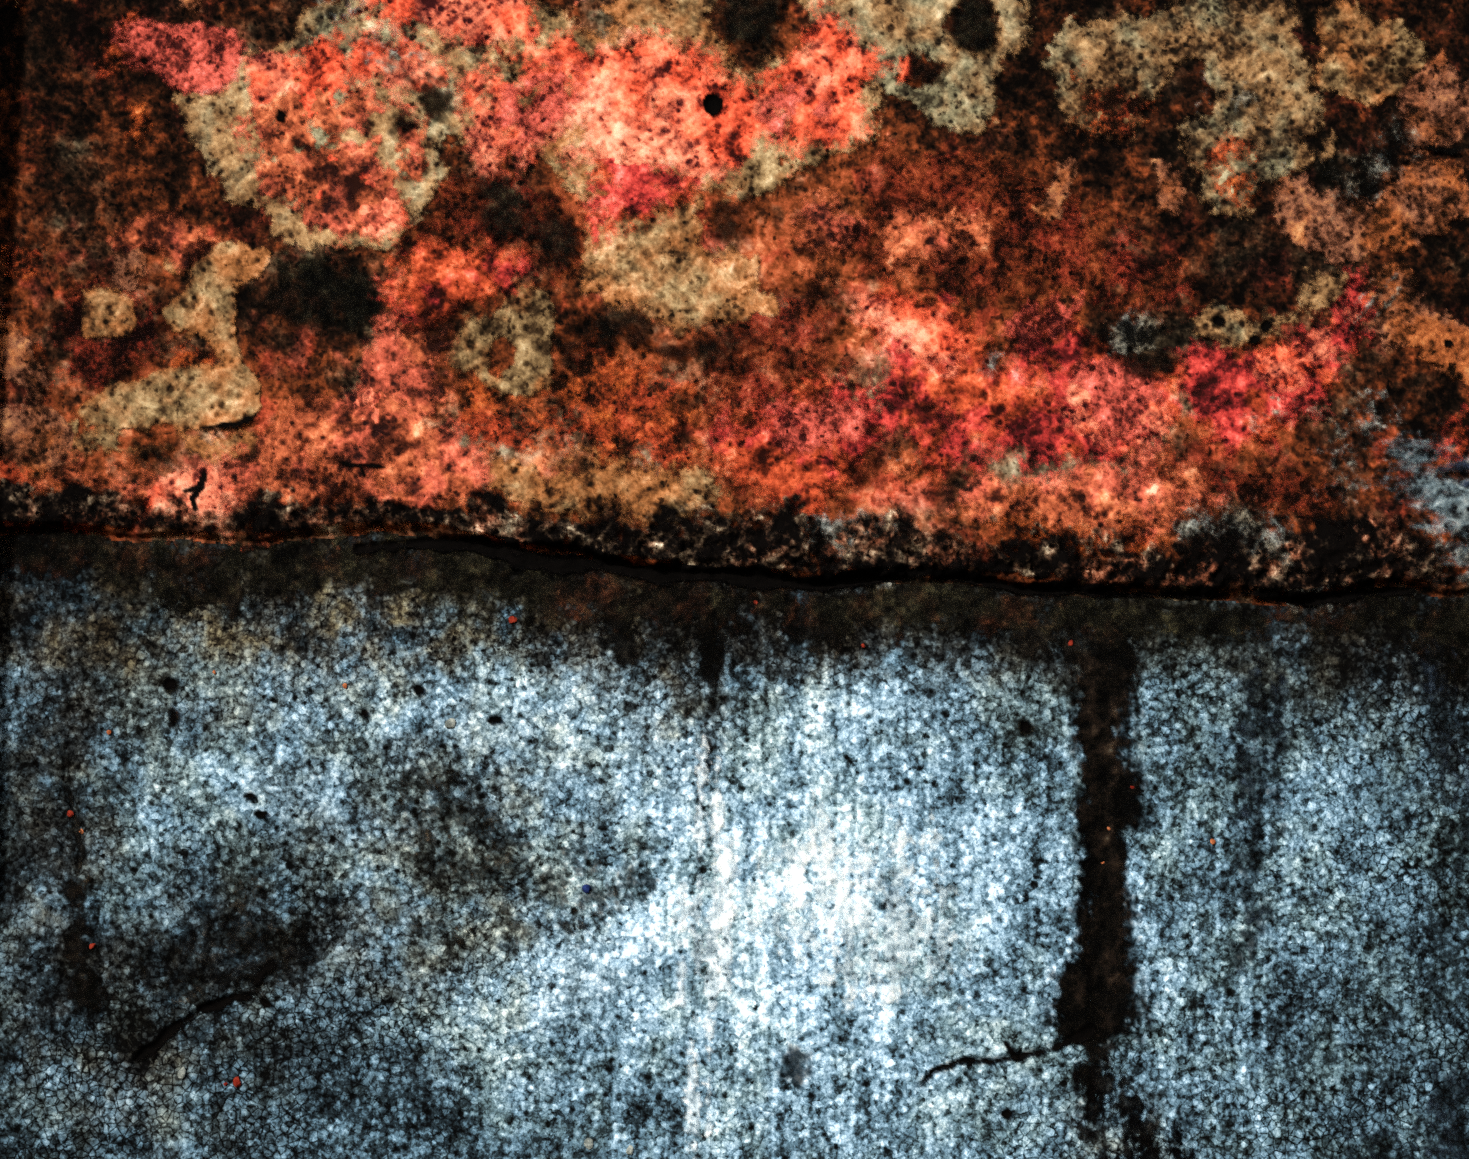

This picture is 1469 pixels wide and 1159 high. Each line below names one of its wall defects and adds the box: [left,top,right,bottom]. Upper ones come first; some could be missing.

rust [94,11,138,77]
rust [127,104,150,147]
rust [842,139,1198,318]
rust [1070,71,1147,138]
rust [1205,136,1260,207]
rust [49,266,215,394]
rust [452,282,887,517]
rust [990,436,1343,553]
water stain [0,525,1469,1159]
crack [918,1025,1096,1086]